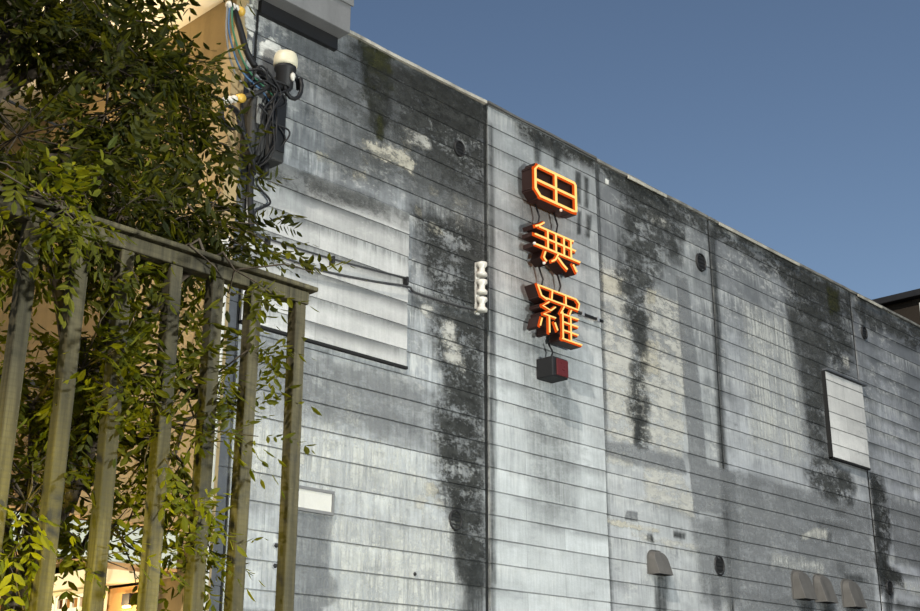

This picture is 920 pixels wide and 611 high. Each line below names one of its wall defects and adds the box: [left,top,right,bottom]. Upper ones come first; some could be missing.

water stain [269,169,386,214]
water stain [256,344,286,400]
water stain [294,62,495,611]
water stain [517,123,920,611]
water stain [252,410,282,481]